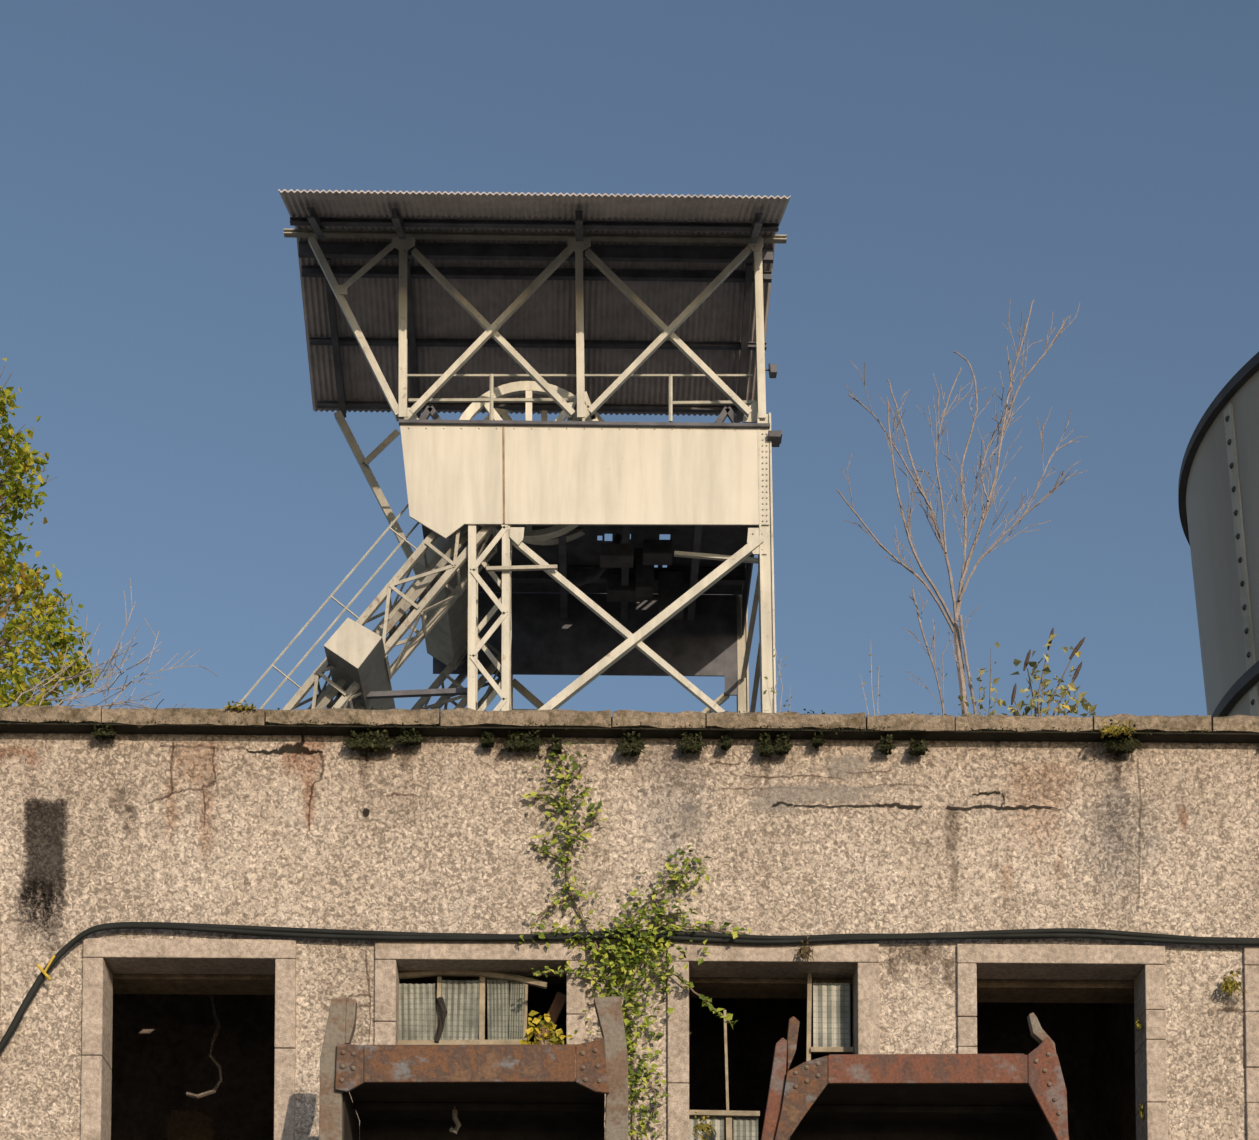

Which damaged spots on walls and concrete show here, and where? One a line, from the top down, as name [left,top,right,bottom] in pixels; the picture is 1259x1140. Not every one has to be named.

crack [148,735,389,831]
crack [710,761,1061,810]